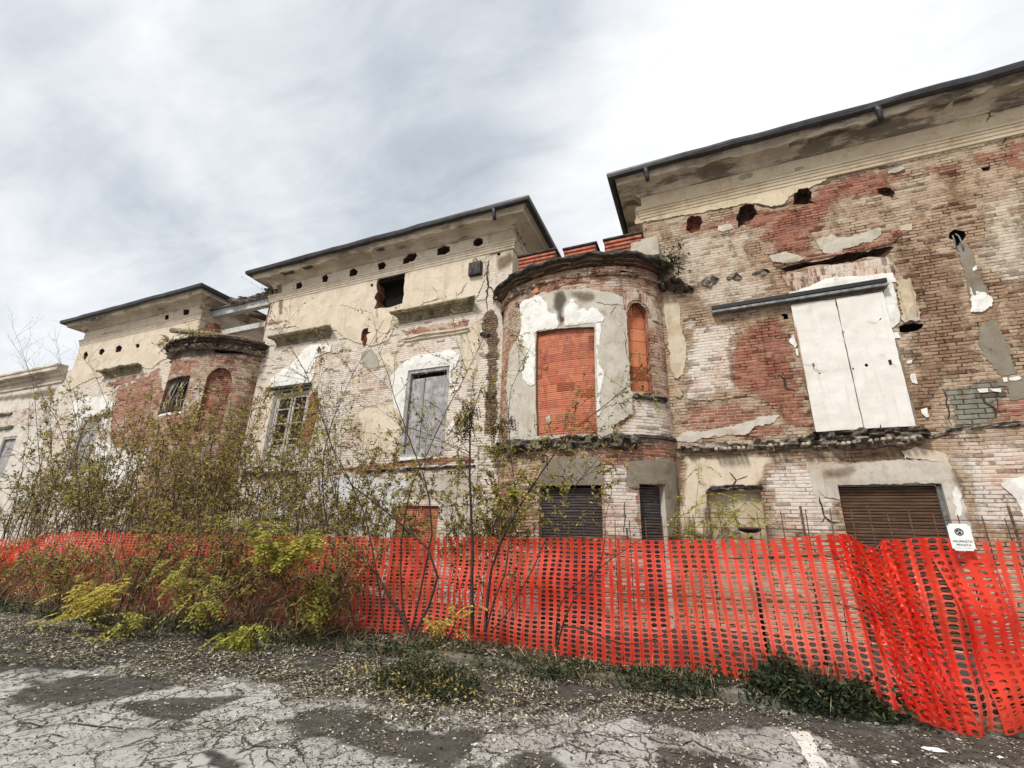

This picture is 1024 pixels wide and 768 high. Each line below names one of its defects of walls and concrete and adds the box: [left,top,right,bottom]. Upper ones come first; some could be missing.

flaking render [508,294,604,416]
leakage [554,291,593,323]
flaking render [597,302,814,463]
flaking render [677,142,1024,421]